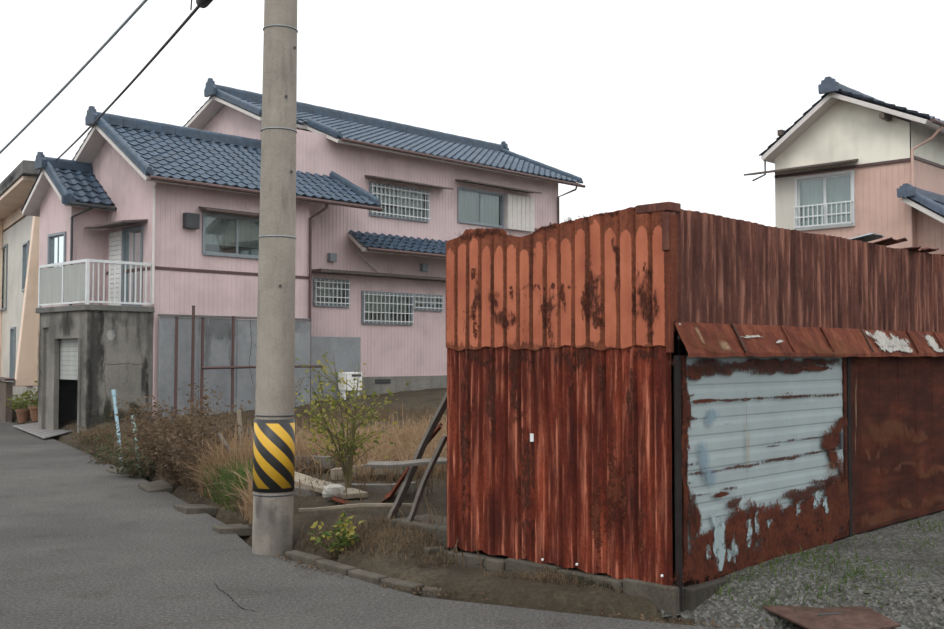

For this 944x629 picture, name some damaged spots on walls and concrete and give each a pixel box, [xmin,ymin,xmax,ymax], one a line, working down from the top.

rust [460,228,502,240]
rust [611,229,620,290]
peeling [865,330,913,353]
peeling [925,335,944,353]
rust [447,267,854,587]
peeling [707,512,771,571]